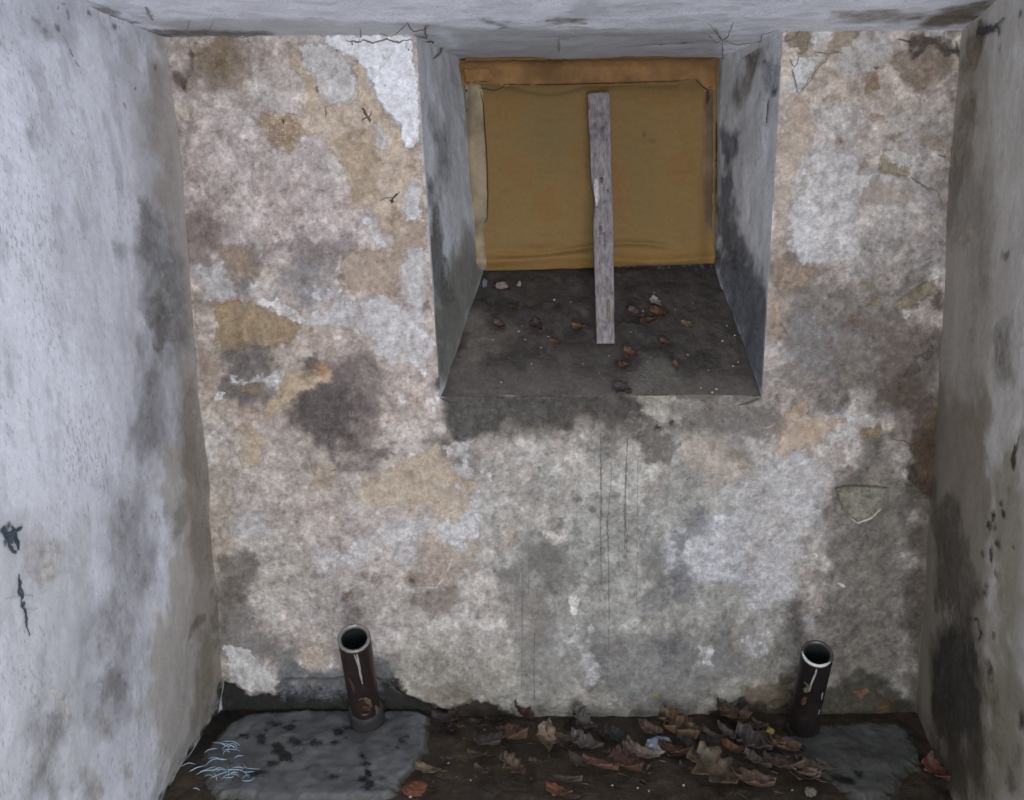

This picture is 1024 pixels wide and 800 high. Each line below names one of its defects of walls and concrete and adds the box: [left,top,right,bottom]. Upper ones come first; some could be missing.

flaking render [194,35,437,377]
leakage [290,354,386,471]
leakage [436,378,830,615]
spalling [835,485,889,524]
crack [0,523,30,636]
spalling [183,645,350,763]
spalling [374,658,448,713]
leakage [932,500,1000,800]